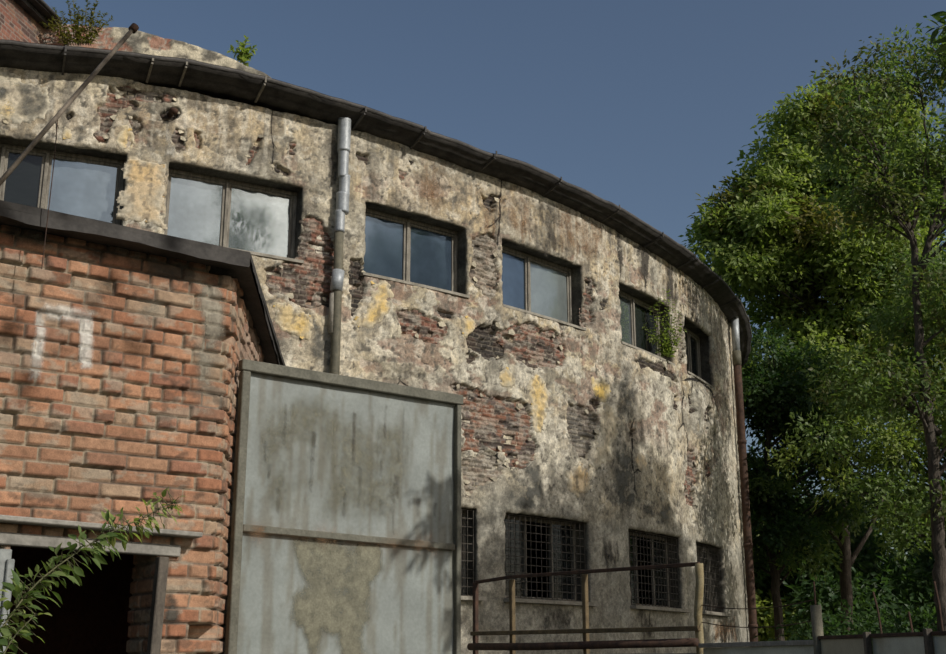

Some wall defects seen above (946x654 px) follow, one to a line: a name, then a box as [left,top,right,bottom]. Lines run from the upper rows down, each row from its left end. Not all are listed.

peeling [93,86,200,229]
spalling [265,217,334,341]
spalling [469,234,499,301]
spalling [348,259,565,498]
spalling [565,376,633,497]
spalling [684,451,711,506]